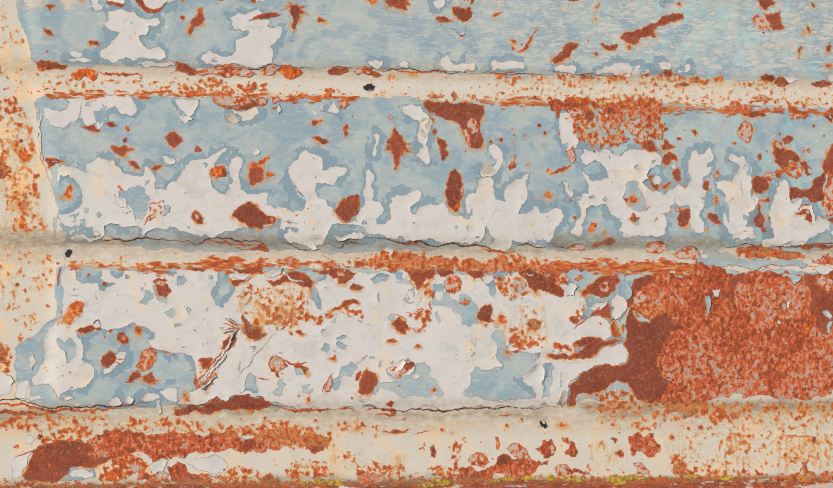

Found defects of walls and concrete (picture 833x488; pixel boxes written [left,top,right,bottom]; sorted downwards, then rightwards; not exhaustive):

peeling [35,0,309,80]
rust [594,0,686,57]
peeling [44,93,146,133]
peeling [171,99,200,126]
rust [35,67,359,114]
peeling [311,98,349,121]
rust [0,96,64,234]
rust [232,201,279,231]
peeling [56,104,833,285]
rust [751,132,833,237]
peeling [0,267,629,420]
rust [0,245,833,488]